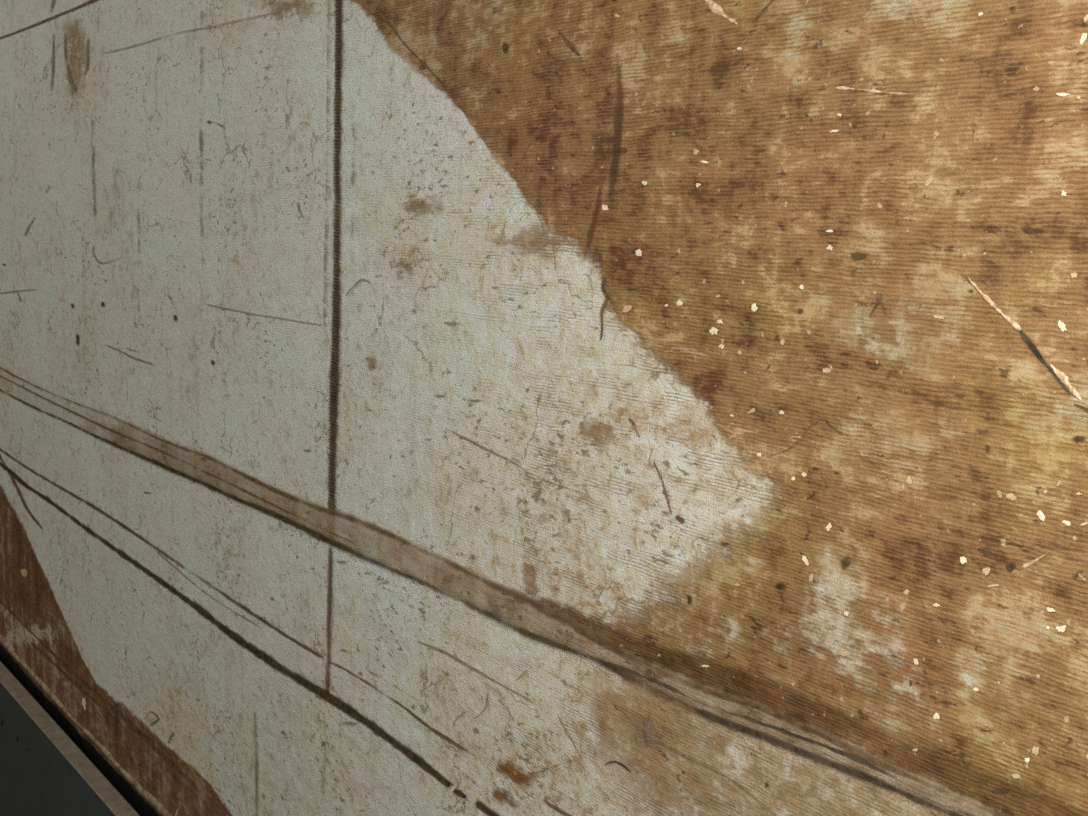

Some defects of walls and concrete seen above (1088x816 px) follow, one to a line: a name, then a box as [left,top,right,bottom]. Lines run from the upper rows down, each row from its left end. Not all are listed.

water stain [0,486,232,816]
water stain [350,0,1088,816]
crack [968,278,1088,416]
crack [1022,552,1050,568]